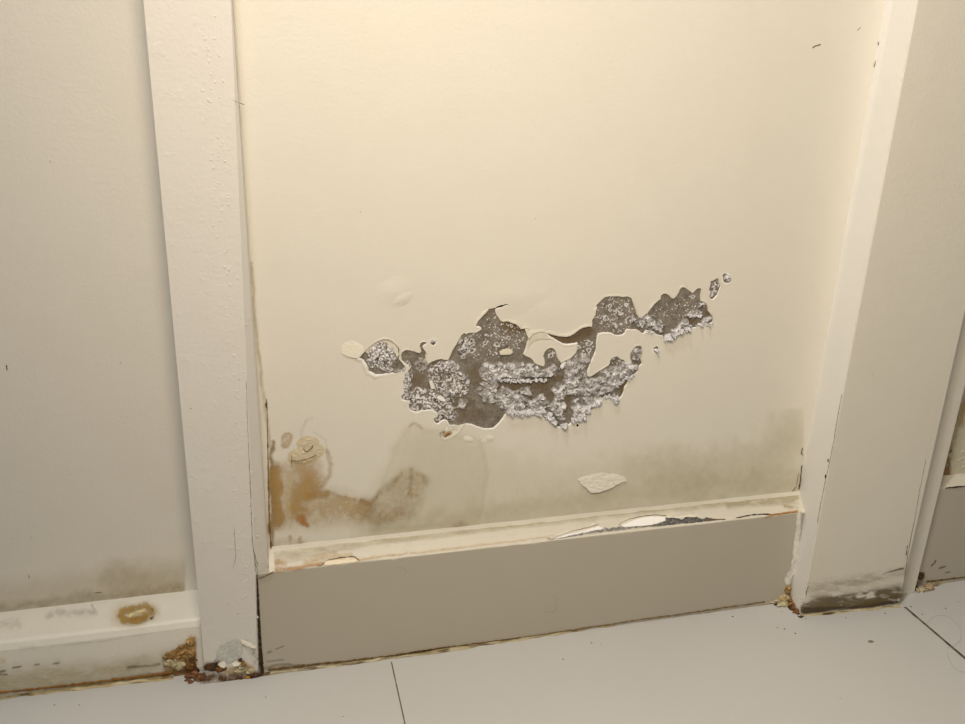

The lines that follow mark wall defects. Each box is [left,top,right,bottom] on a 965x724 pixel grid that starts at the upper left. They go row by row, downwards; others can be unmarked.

peeling [341,274,728,431]
peeling [578,473,627,493]
damp [702,496,798,506]
peeling [549,514,726,540]
corrosion [117,603,154,624]
corrosion [770,585,804,618]
damp [800,587,902,614]
corrosion [160,637,270,684]